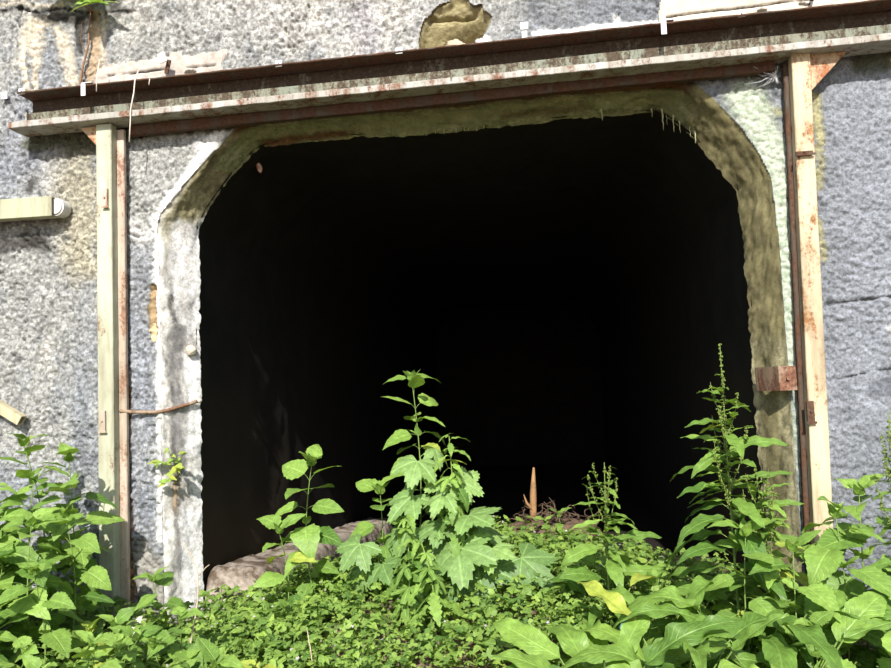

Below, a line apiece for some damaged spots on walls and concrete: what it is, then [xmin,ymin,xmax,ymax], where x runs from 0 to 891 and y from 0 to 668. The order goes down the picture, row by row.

crack [1,5,130,28]
spalling [419,0,492,49]
spalling [147,284,159,342]
crack [832,295,891,304]